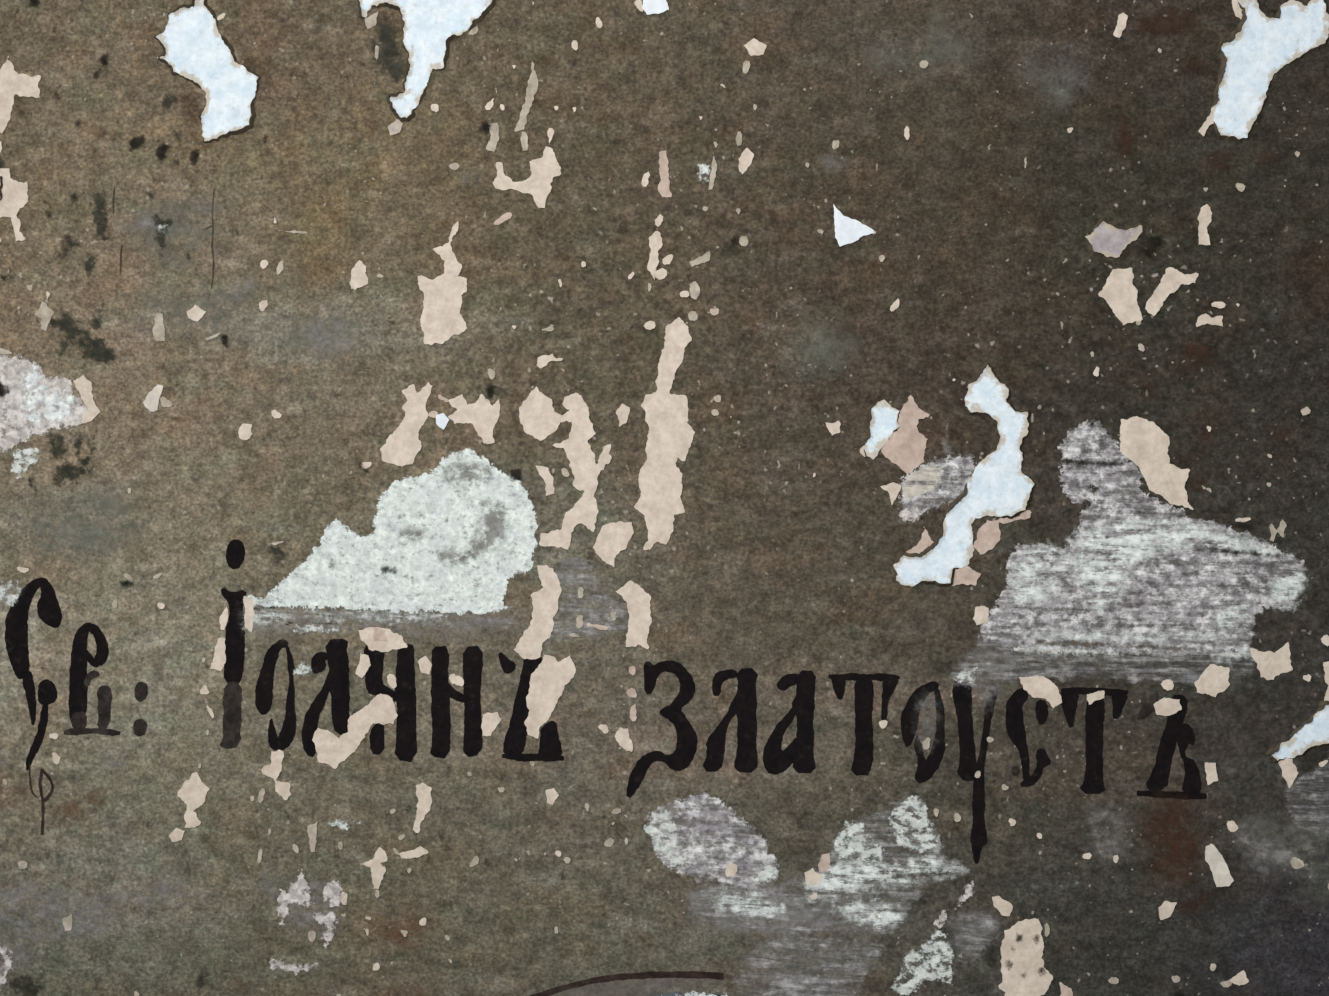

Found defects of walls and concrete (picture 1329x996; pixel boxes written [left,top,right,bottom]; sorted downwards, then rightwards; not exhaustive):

peeling [154,0,261,144]
peeling [357,0,496,135]
peeling [1198,0,1329,141]
peeling [418,221,467,345]
peeling [628,214,673,292]
peeling [519,251,719,567]
peeling [860,362,1036,587]
flaking render [1119,416,1193,510]
peeling [1087,691,1105,705]
peeling [1153,679,1182,716]
peeling [1194,664,1230,697]
peeling [992,896,1073,996]